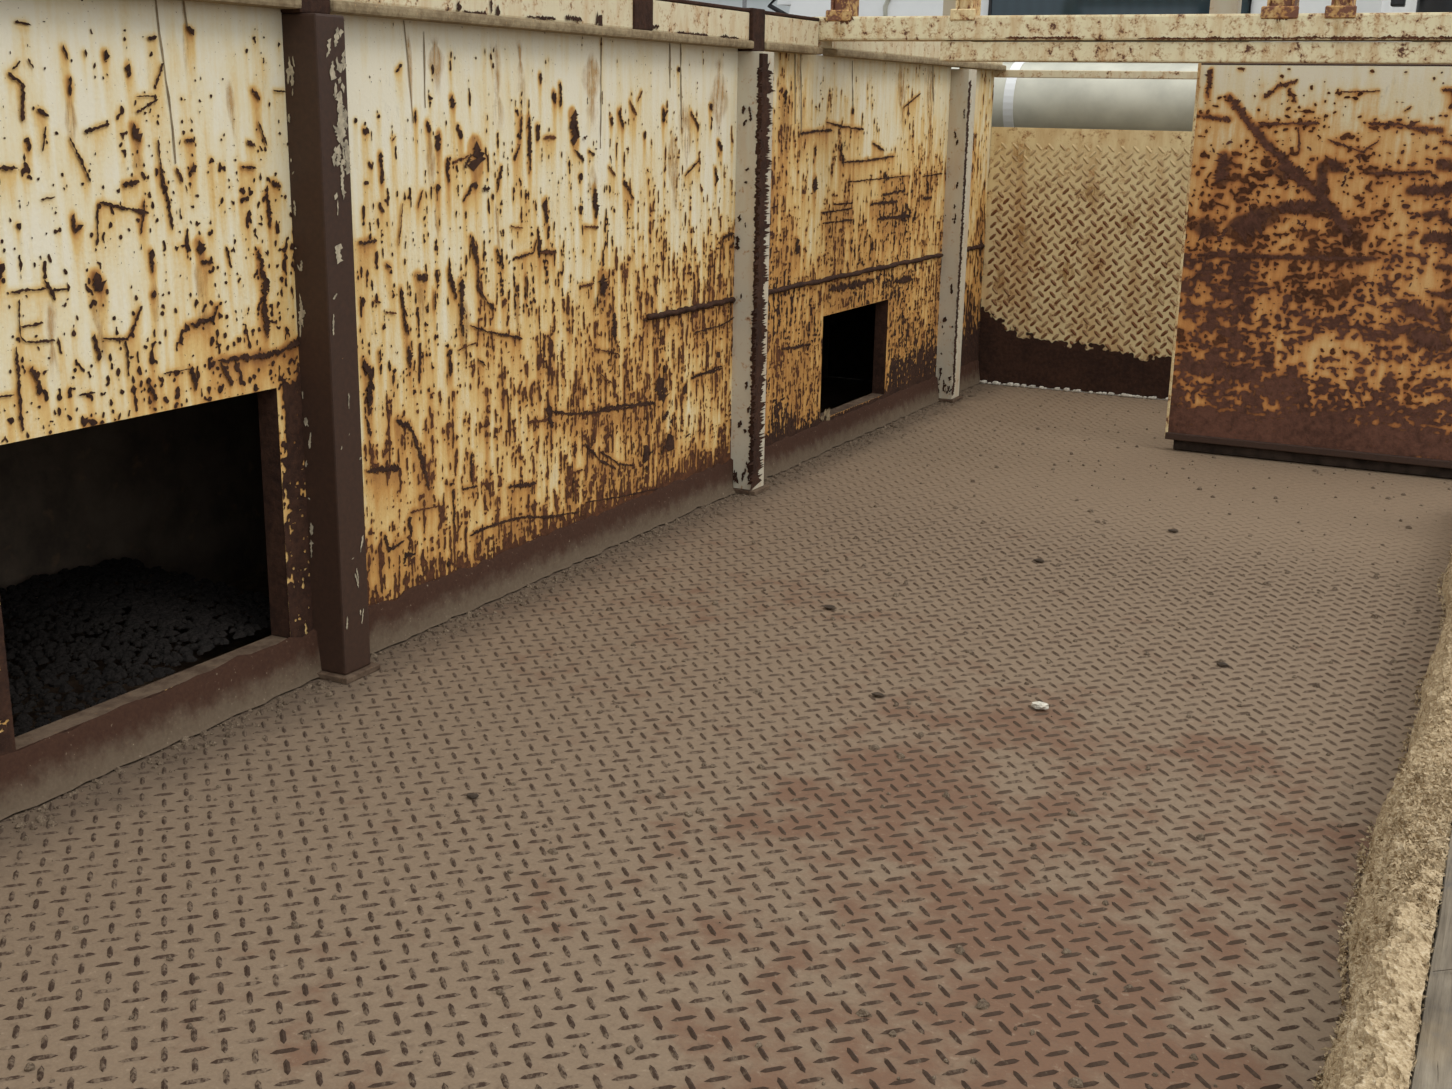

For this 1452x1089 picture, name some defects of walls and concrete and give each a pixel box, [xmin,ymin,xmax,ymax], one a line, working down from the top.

corrosion [570,60,597,145]
corrosion [633,0,653,31]
corrosion [1138,19,1452,41]
peeling [0,29,313,637]
corrosion [218,250,300,364]
corrosion [551,363,691,471]
peeling [354,51,994,606]
corrosion [695,8,811,491]
corrosion [952,81,972,396]
corrosion [978,306,1172,399]
corrosion [1197,94,1452,262]
peeling [0,606,85,756]